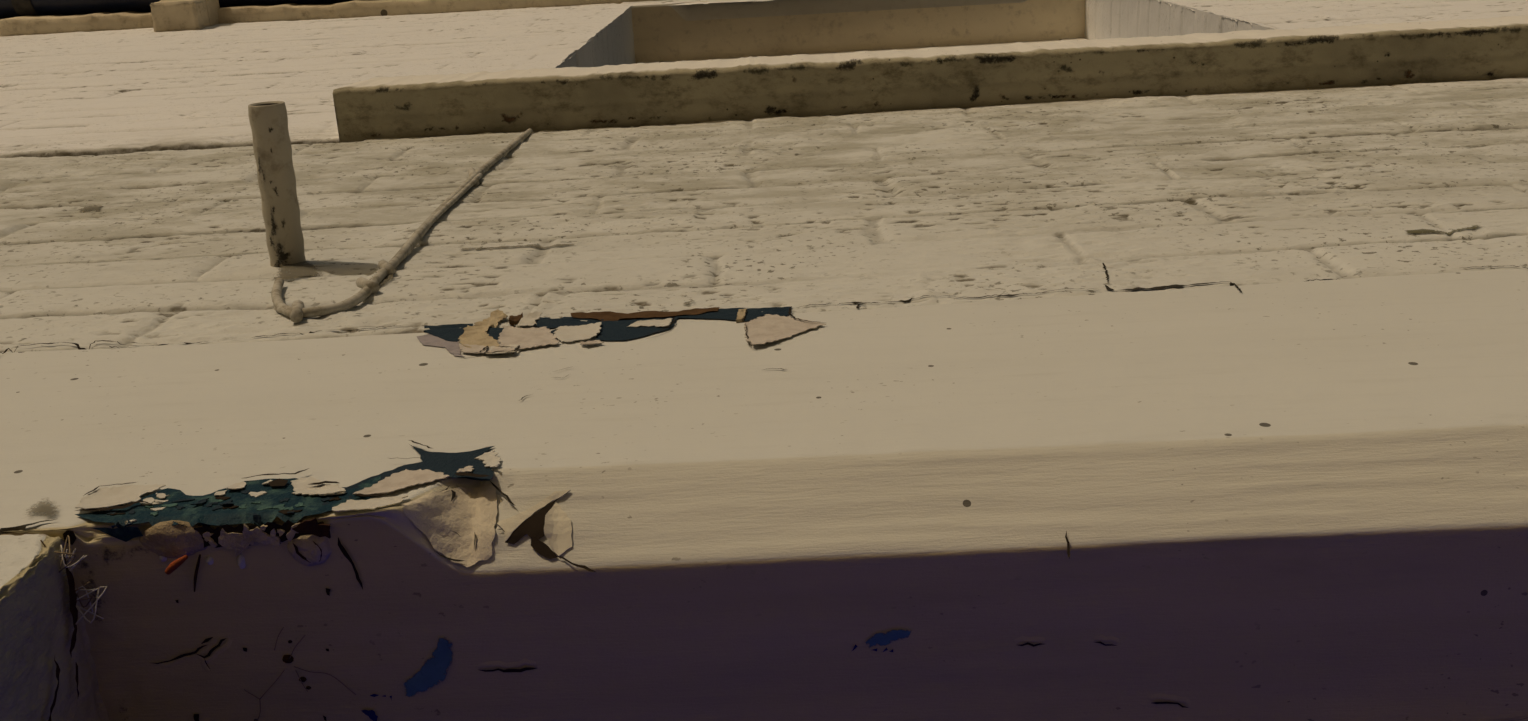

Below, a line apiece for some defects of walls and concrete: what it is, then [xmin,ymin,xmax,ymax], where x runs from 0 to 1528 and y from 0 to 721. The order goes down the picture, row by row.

crack [0,340,206,354]
peeling [416,306,826,357]
peeling [63,440,501,556]